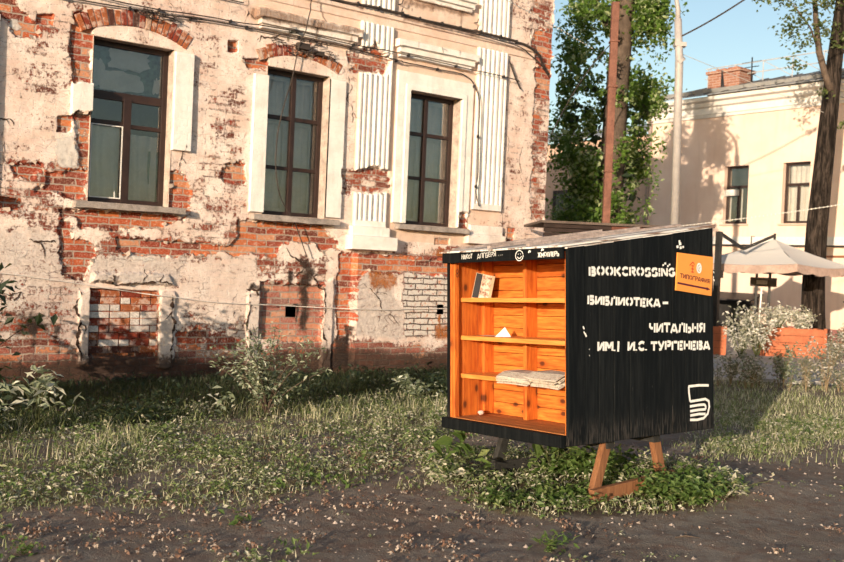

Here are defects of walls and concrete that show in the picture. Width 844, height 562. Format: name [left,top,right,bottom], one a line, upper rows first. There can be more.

spalling [0,0,54,38]
spalling [68,11,94,83]
spalling [227,41,237,53]
spalling [242,54,270,71]
spalling [528,0,555,222]
spalling [0,197,21,212]
spalling [9,110,447,343]
spalling [88,289,160,359]
crack [73,269,179,366]
spalling [173,328,202,352]
crack [232,287,262,358]